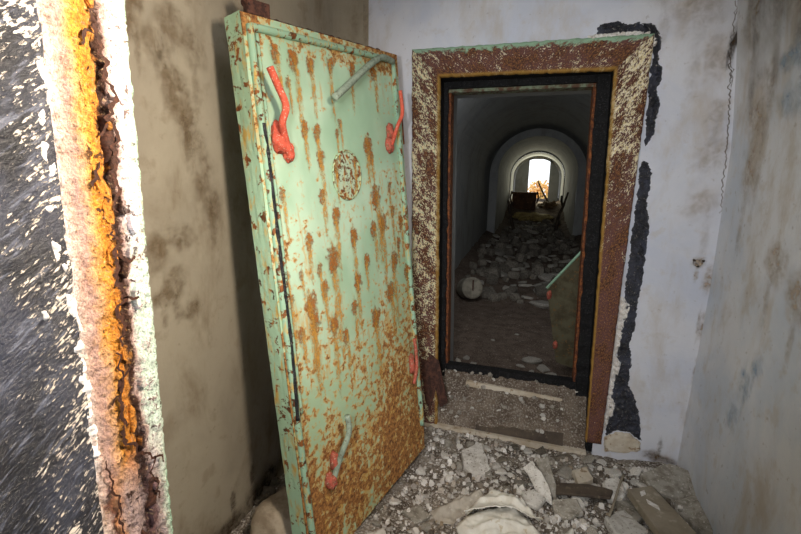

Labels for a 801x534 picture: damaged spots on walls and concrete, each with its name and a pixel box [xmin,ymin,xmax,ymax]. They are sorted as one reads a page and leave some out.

flaking render [587,31,657,47]
rust [79,76,98,109]
rust [112,135,126,162]
rust [92,160,140,233]
rust [106,245,133,279]
rust [421,353,448,411]
rust [118,404,151,449]
rust [149,501,169,534]